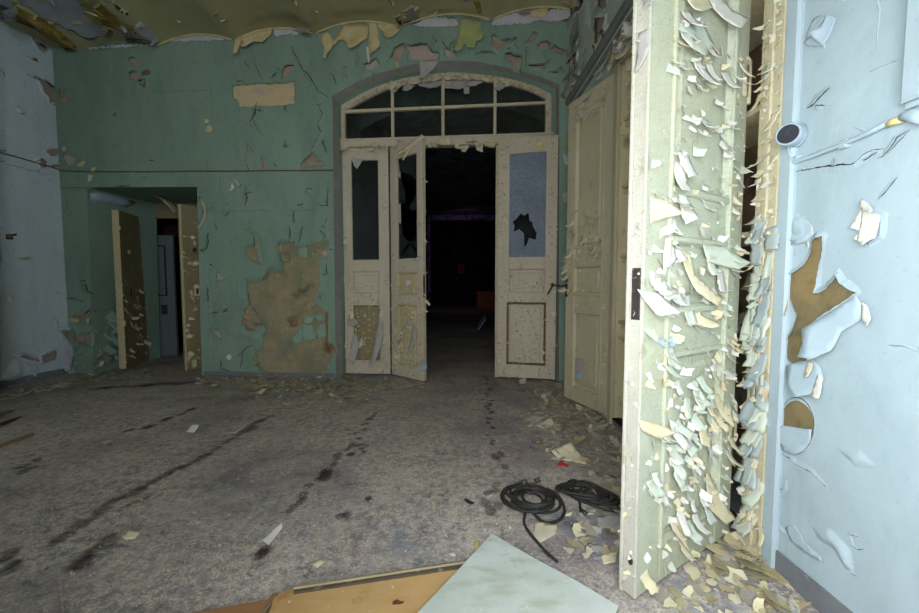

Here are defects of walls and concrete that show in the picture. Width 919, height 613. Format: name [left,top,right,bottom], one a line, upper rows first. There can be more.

crack [248,102,287,136]
crack [270,46,329,154]
crack [796,127,910,176]
crack [199,186,252,254]
crack [287,187,334,275]
crack [877,176,898,200]
peeling [779,216,871,456]